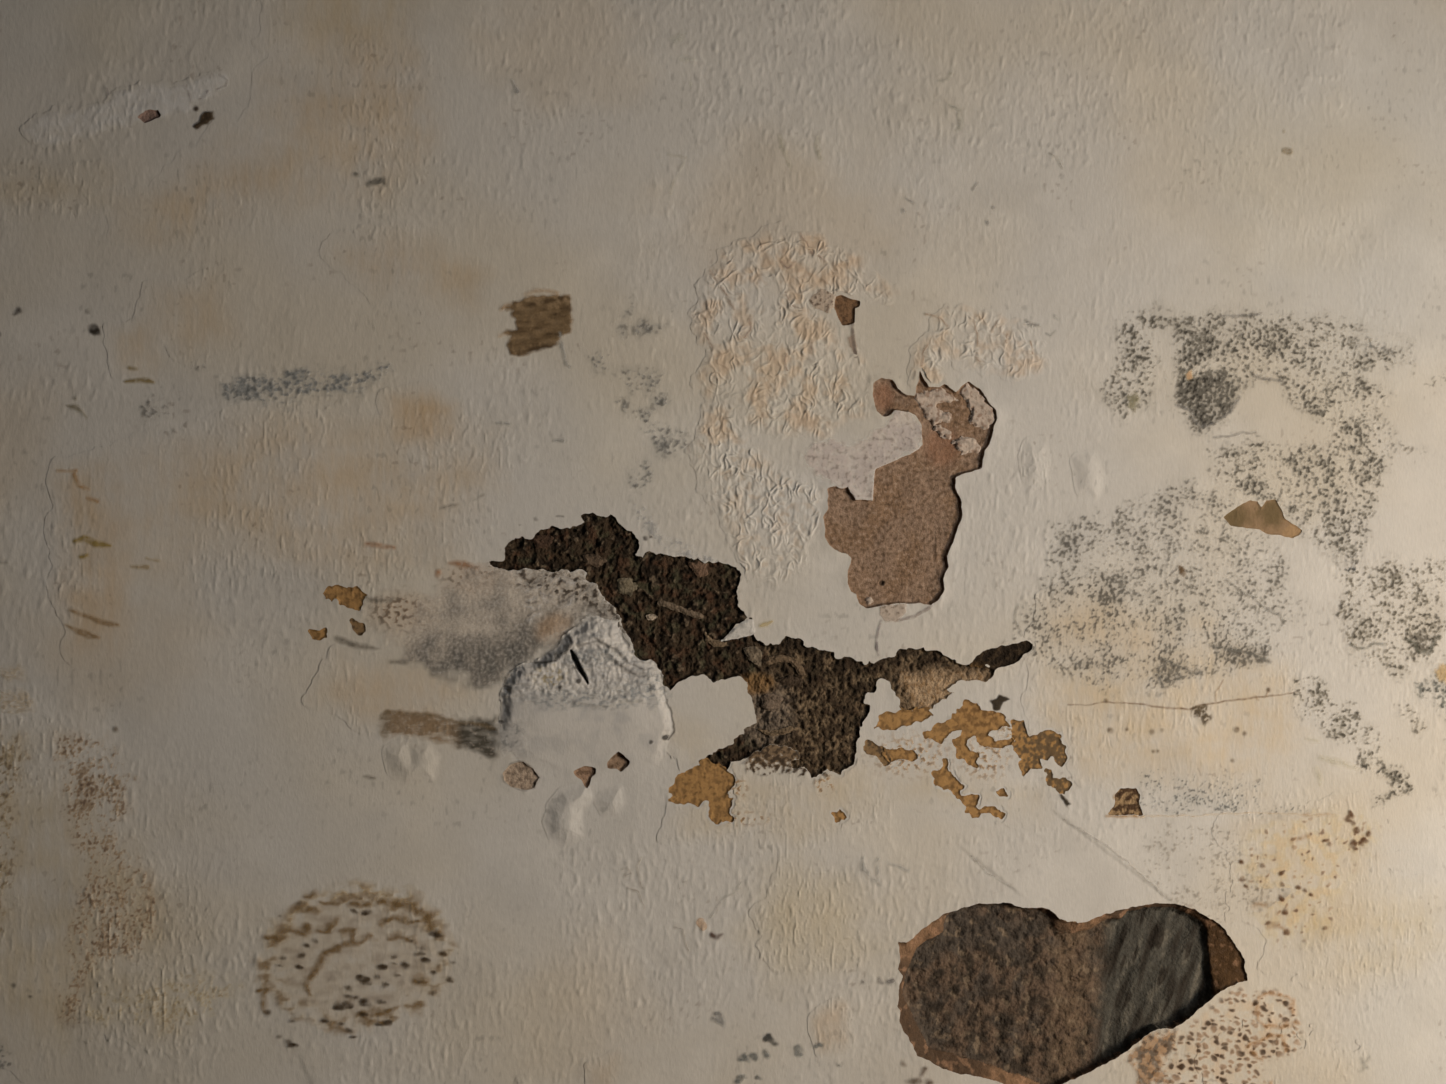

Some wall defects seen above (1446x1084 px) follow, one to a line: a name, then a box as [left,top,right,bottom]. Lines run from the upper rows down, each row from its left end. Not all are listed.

damp [0,0,626,758]
peeling [685,220,1053,652]
peeling [1224,499,1302,538]
damp [1101,312,1446,734]
damp [0,712,213,1083]
peeling [668,758,735,825]
peeling [646,601,806,675]
damp [657,755,1070,983]
peeling [863,699,1072,819]
spalling [897,902,1248,1084]
damp [991,487,1446,995]
damp [1165,1018,1372,1084]